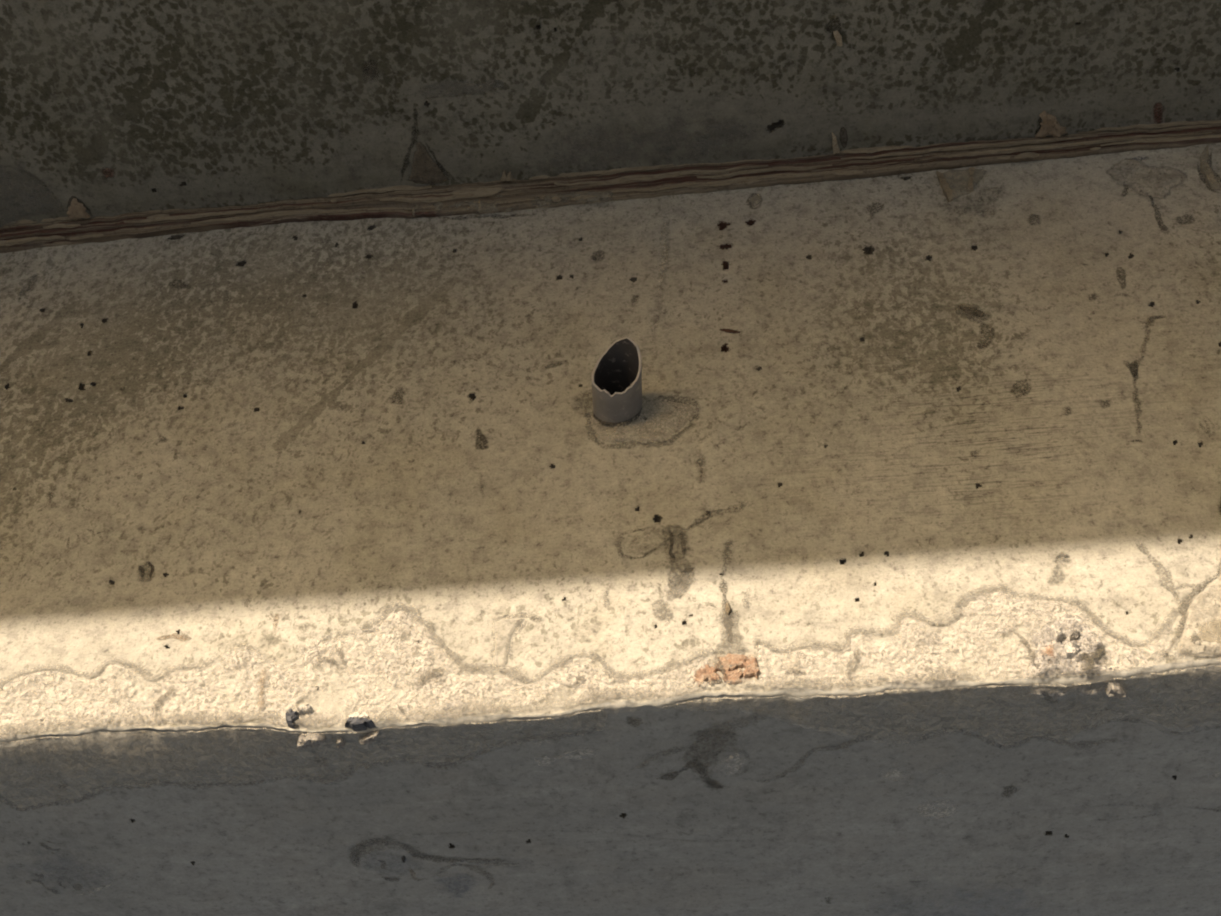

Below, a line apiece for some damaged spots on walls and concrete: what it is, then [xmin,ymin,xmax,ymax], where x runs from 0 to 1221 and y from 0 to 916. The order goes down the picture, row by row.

crack [1125,316,1164,442]
crack [710,542,749,653]
crack [1137,543,1220,645]